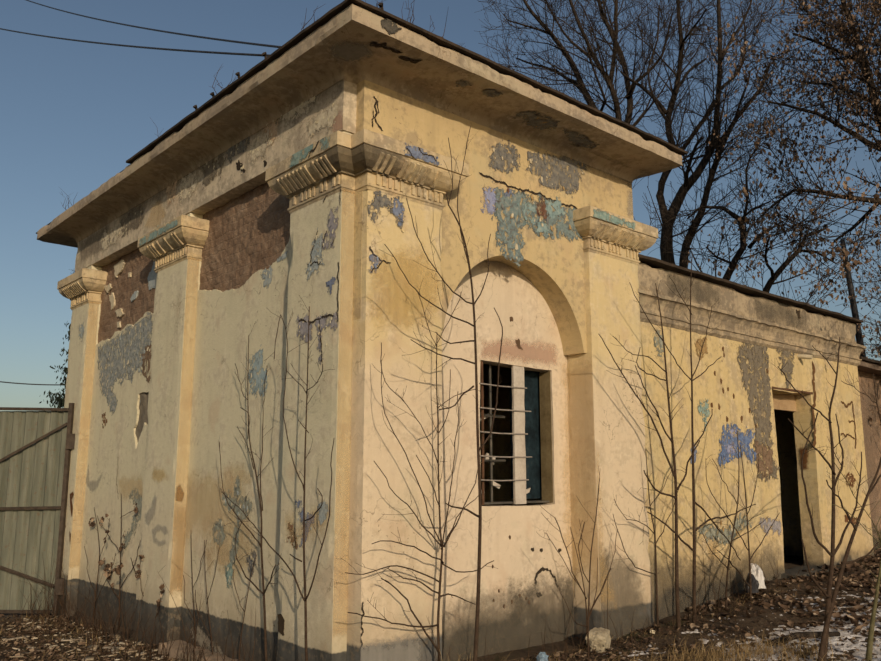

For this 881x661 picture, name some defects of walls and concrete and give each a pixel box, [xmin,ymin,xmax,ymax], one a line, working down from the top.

crack [372,96,383,131]
peeling [368,191,405,232]
crack [479,172,577,211]
peeling [480,138,587,268]
spalling [97,95,339,442]
peeling [698,367,774,479]
peeling [124,486,142,548]
peeling [212,476,256,588]
peeling [285,496,329,550]
peeling [698,513,781,546]
water stain [442,582,574,661]